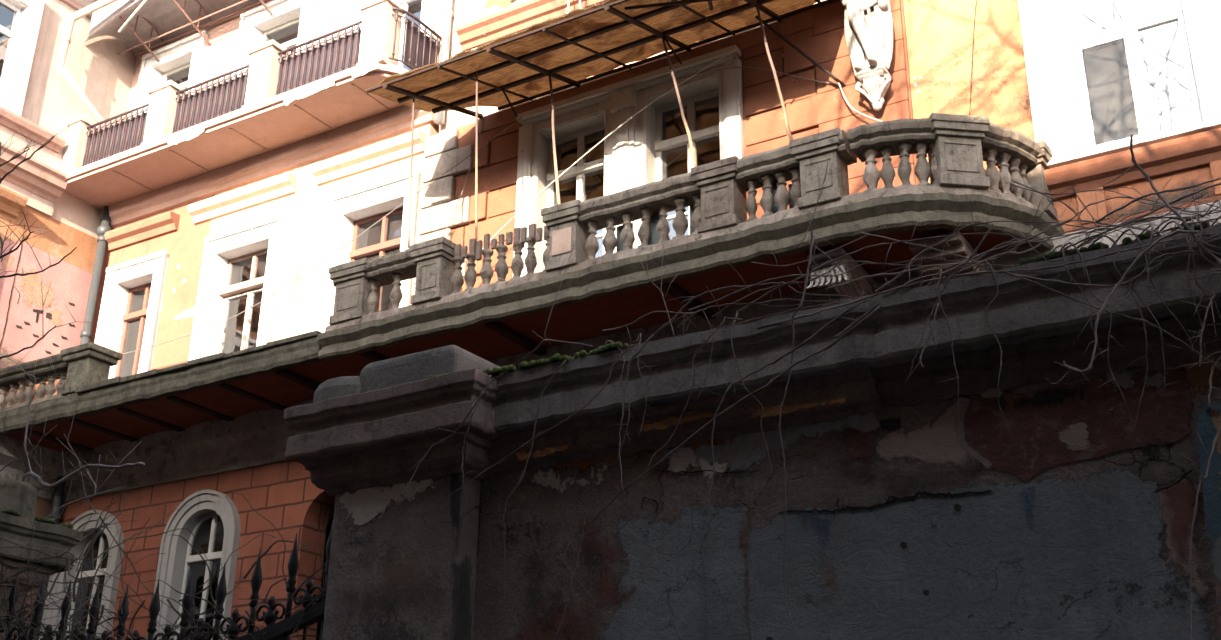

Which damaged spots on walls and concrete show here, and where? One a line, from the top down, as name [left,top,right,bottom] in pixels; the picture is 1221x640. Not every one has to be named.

flaking render [1178,351,1221,396]
peeling [876,404,981,471]
peeling [339,478,444,526]
damp [341,473,481,640]